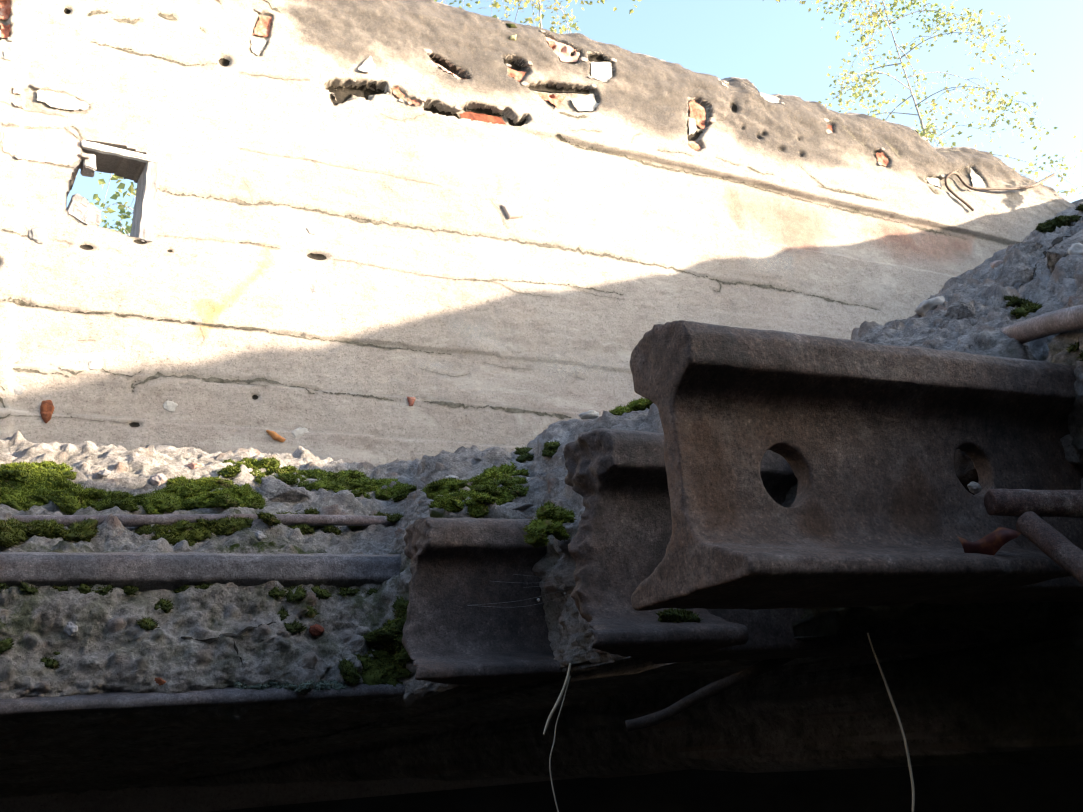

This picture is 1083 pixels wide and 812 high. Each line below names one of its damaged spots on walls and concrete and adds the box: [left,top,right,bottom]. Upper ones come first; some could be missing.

spalling [0,0,14,42]
spalling [9,83,90,114]
spalling [322,56,530,126]
spalling [424,49,471,80]
spalling [502,30,617,113]
leakage [295,0,1054,190]
spalling [0,123,91,168]
spalling [686,97,717,152]
spalling [925,166,988,192]
spalling [999,305,1083,344]